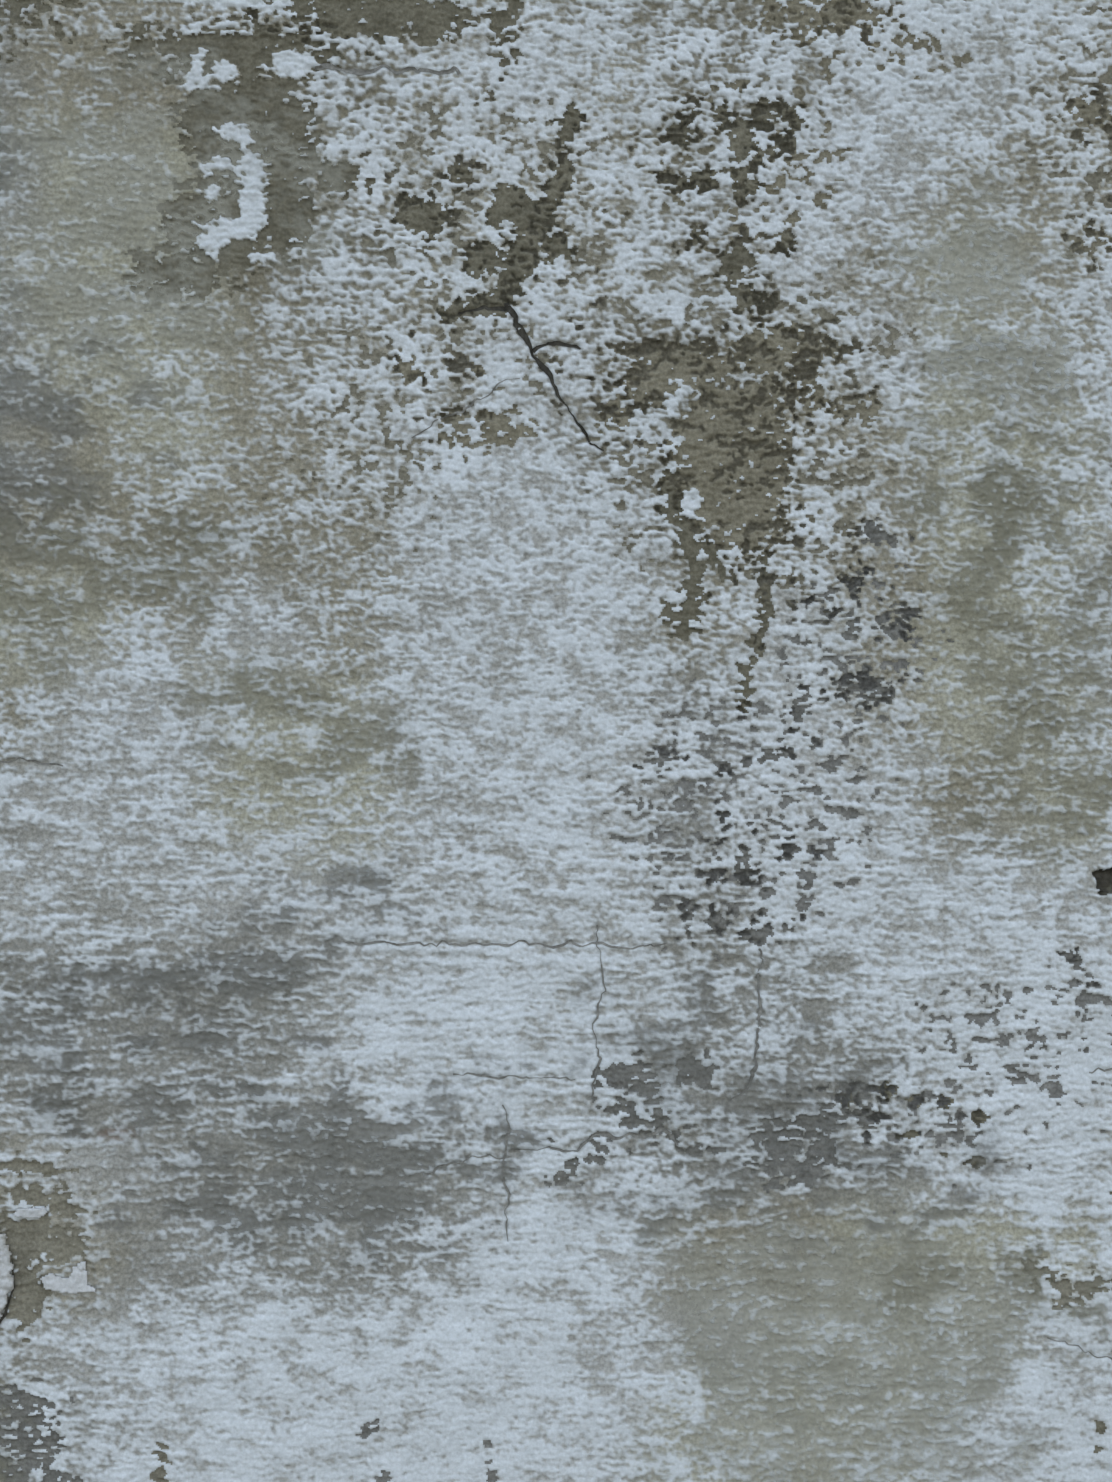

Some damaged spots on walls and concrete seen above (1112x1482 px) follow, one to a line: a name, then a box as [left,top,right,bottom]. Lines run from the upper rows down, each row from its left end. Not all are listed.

crack [411,302,604,451]
peeling [103,0,973,962]
spalling [1092,868,1112,895]
peeling [0,1149,98,1343]
water stain [682,1215,1042,1482]
peeling [1021,1256,1112,1310]
crack [1047,1337,1112,1360]
peeling [1094,1420,1107,1453]